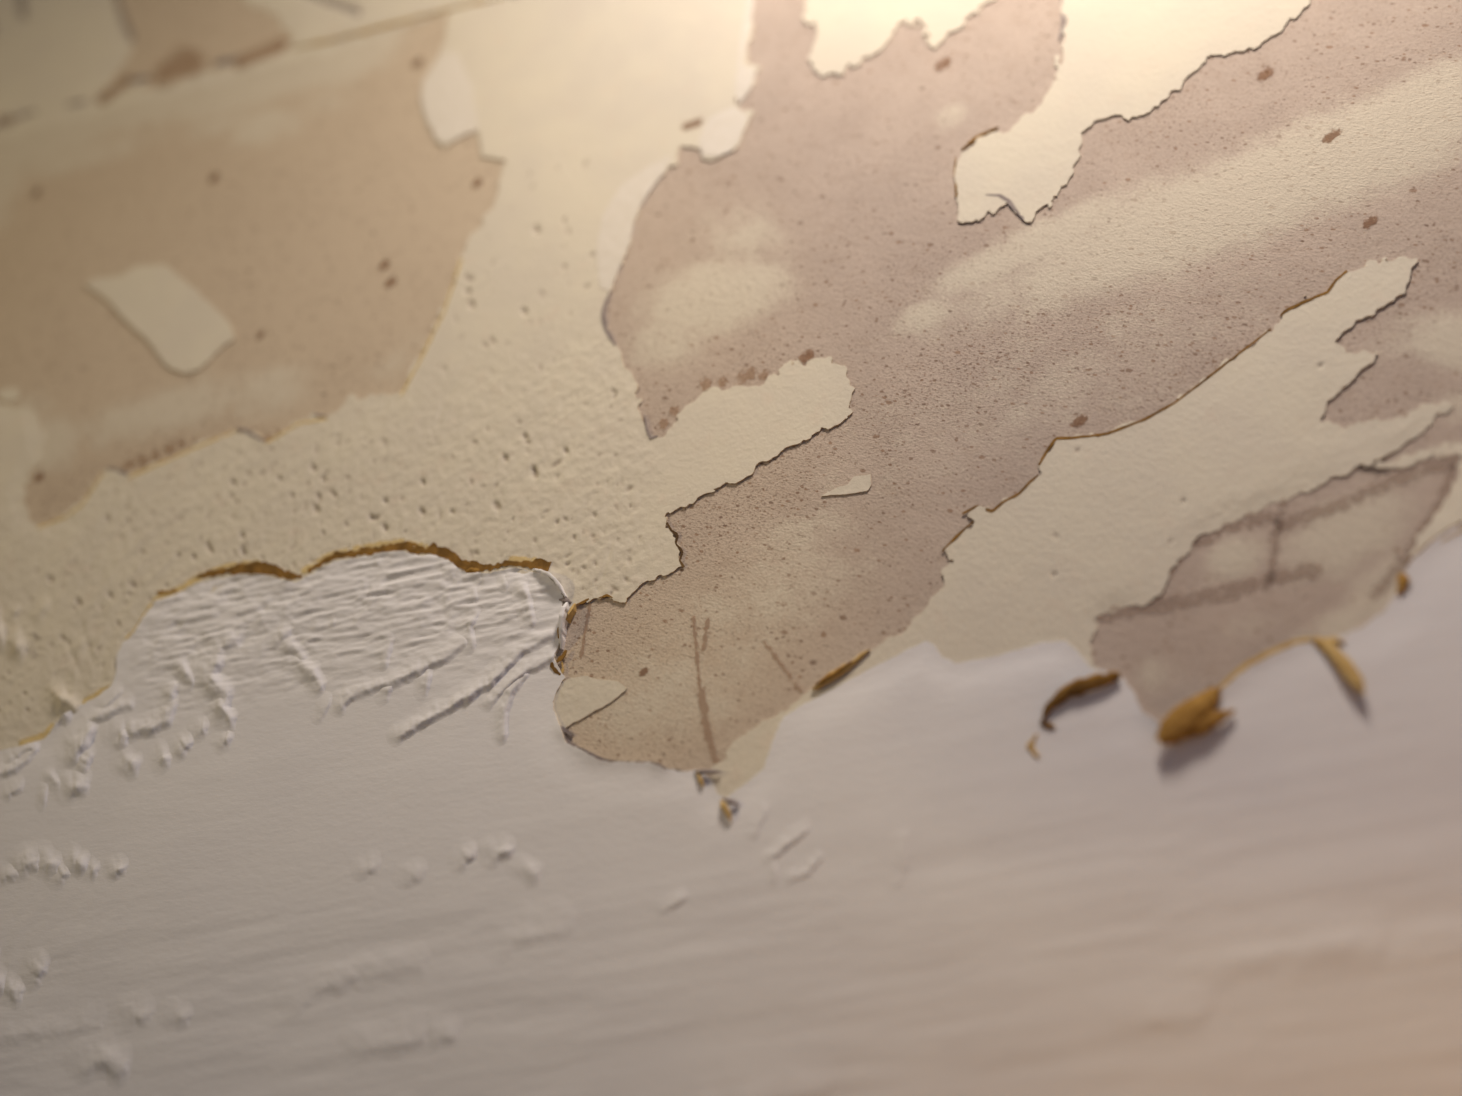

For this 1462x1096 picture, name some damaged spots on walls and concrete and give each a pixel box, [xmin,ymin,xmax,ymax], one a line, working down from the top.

peeling [0,0,506,528]
peeling [533,0,1462,779]